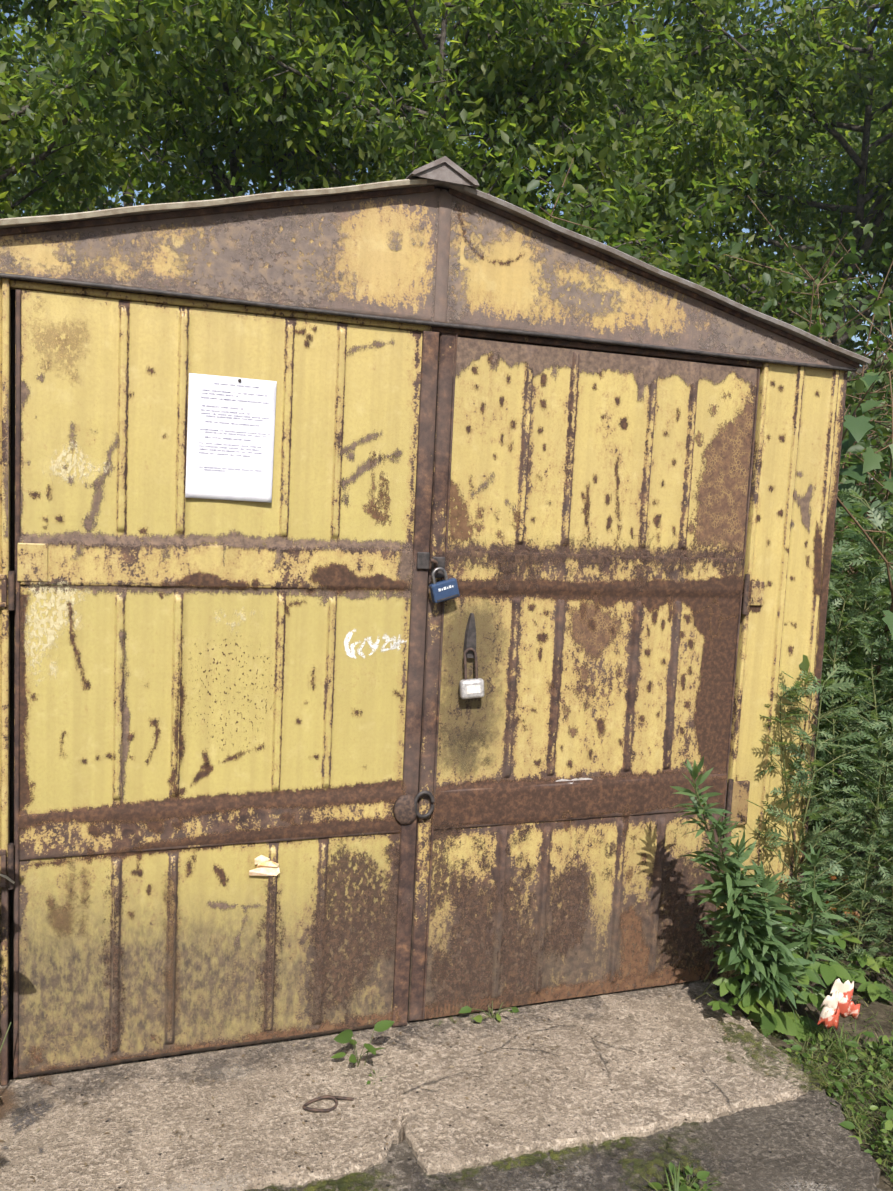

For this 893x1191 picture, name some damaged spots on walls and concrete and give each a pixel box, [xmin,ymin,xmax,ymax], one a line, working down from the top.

corrosion [3,309,829,1080]
corrosion [805,402,843,692]